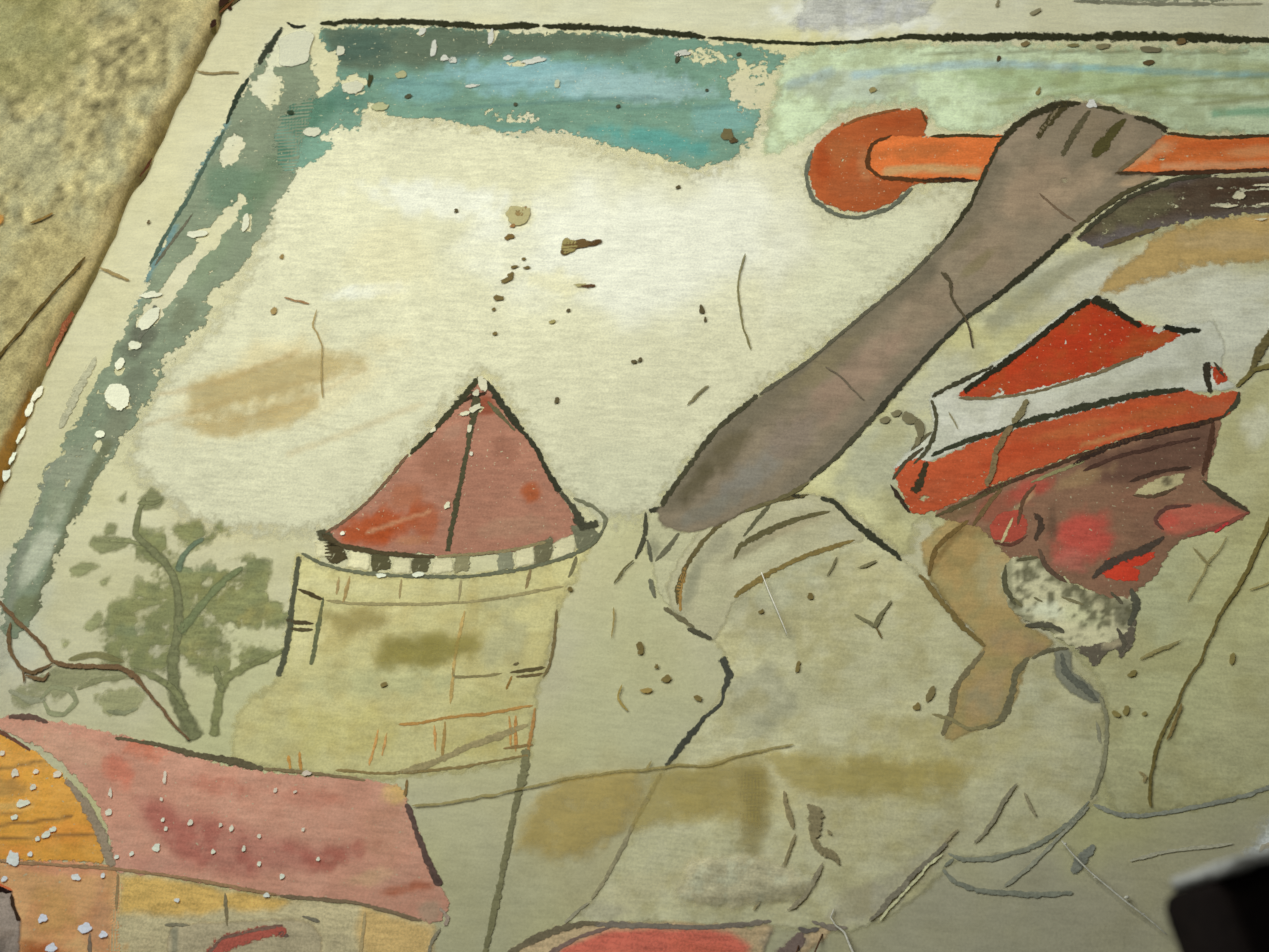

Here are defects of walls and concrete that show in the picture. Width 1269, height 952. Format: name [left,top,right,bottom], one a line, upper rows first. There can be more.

peeling [278,30,314,67]
peeling [419,28,457,63]
peeling [503,55,547,66]
peeling [342,75,373,94]
peeling [303,127,321,137]
peeling [187,230,208,238]
peeling [105,291,162,411]
flaking render [2,386,43,482]
flaking render [0,884,20,952]